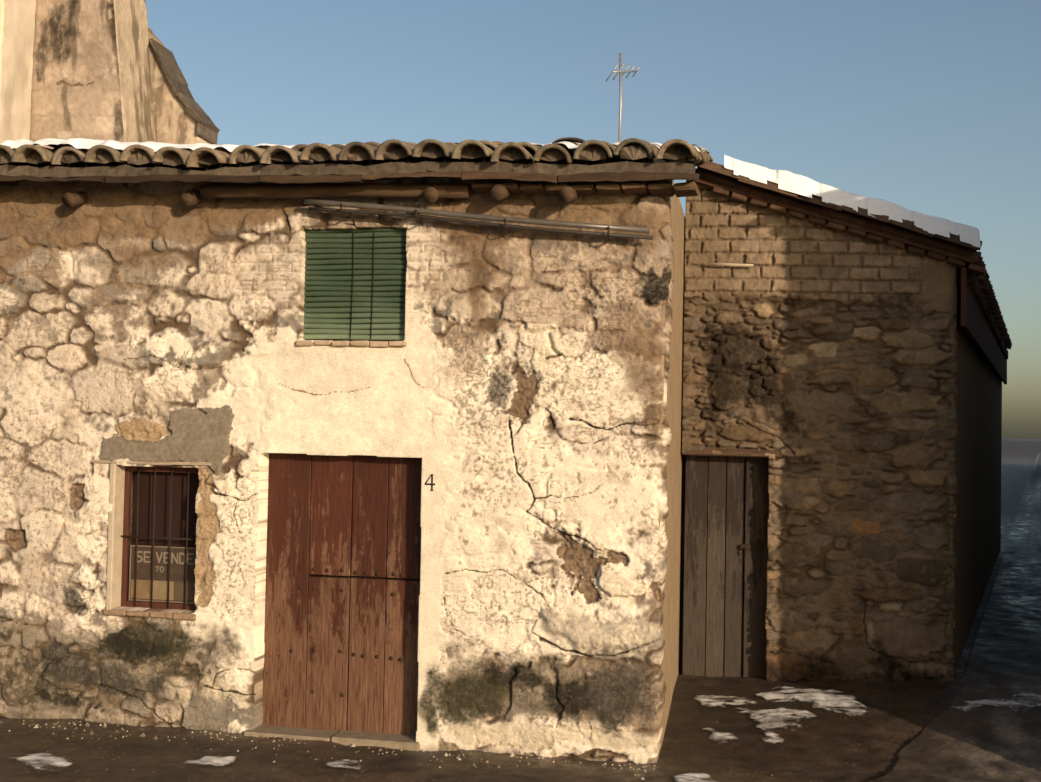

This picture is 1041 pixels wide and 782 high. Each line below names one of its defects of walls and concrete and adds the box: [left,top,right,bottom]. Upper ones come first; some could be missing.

water stain [37,0,79,80]
flaking render [115,417,166,442]
flaking render [486,364,540,425]
crack [508,408,600,531]
crack [569,418,664,444]
flaking render [194,466,235,607]
flaking render [557,528,651,604]
crack [443,569,661,657]
water stain [421,669,440,731]
water stain [482,662,619,740]